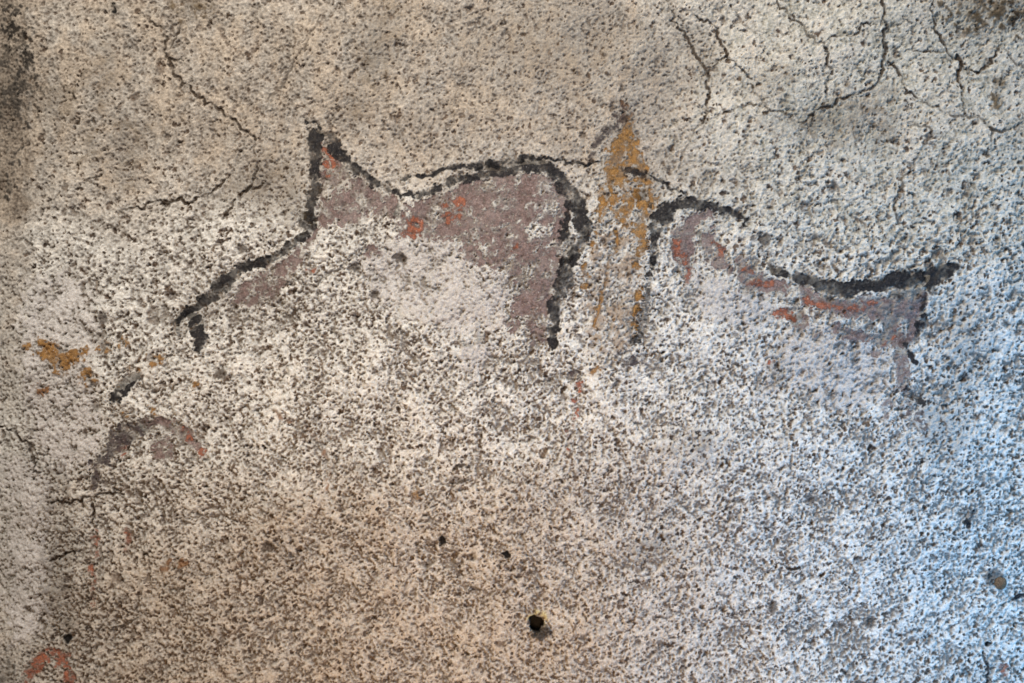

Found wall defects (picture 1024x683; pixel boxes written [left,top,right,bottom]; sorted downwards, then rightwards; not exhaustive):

crack [123,13,265,218]
crack [671,0,1022,223]